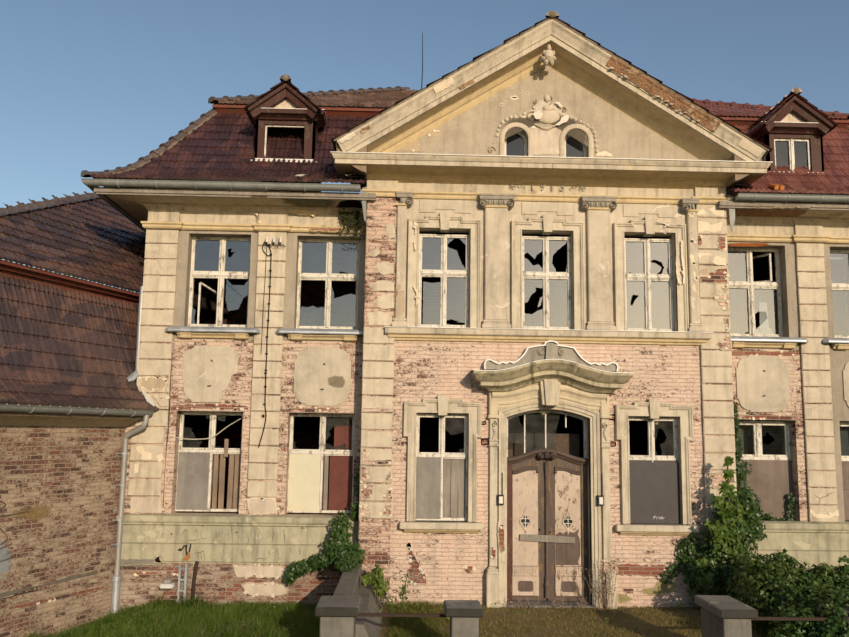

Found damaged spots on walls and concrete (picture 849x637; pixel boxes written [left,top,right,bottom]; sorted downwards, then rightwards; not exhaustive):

flaking render [606,55,721,132]
flaking render [359,448,393,518]
flaking render [406,542,428,586]